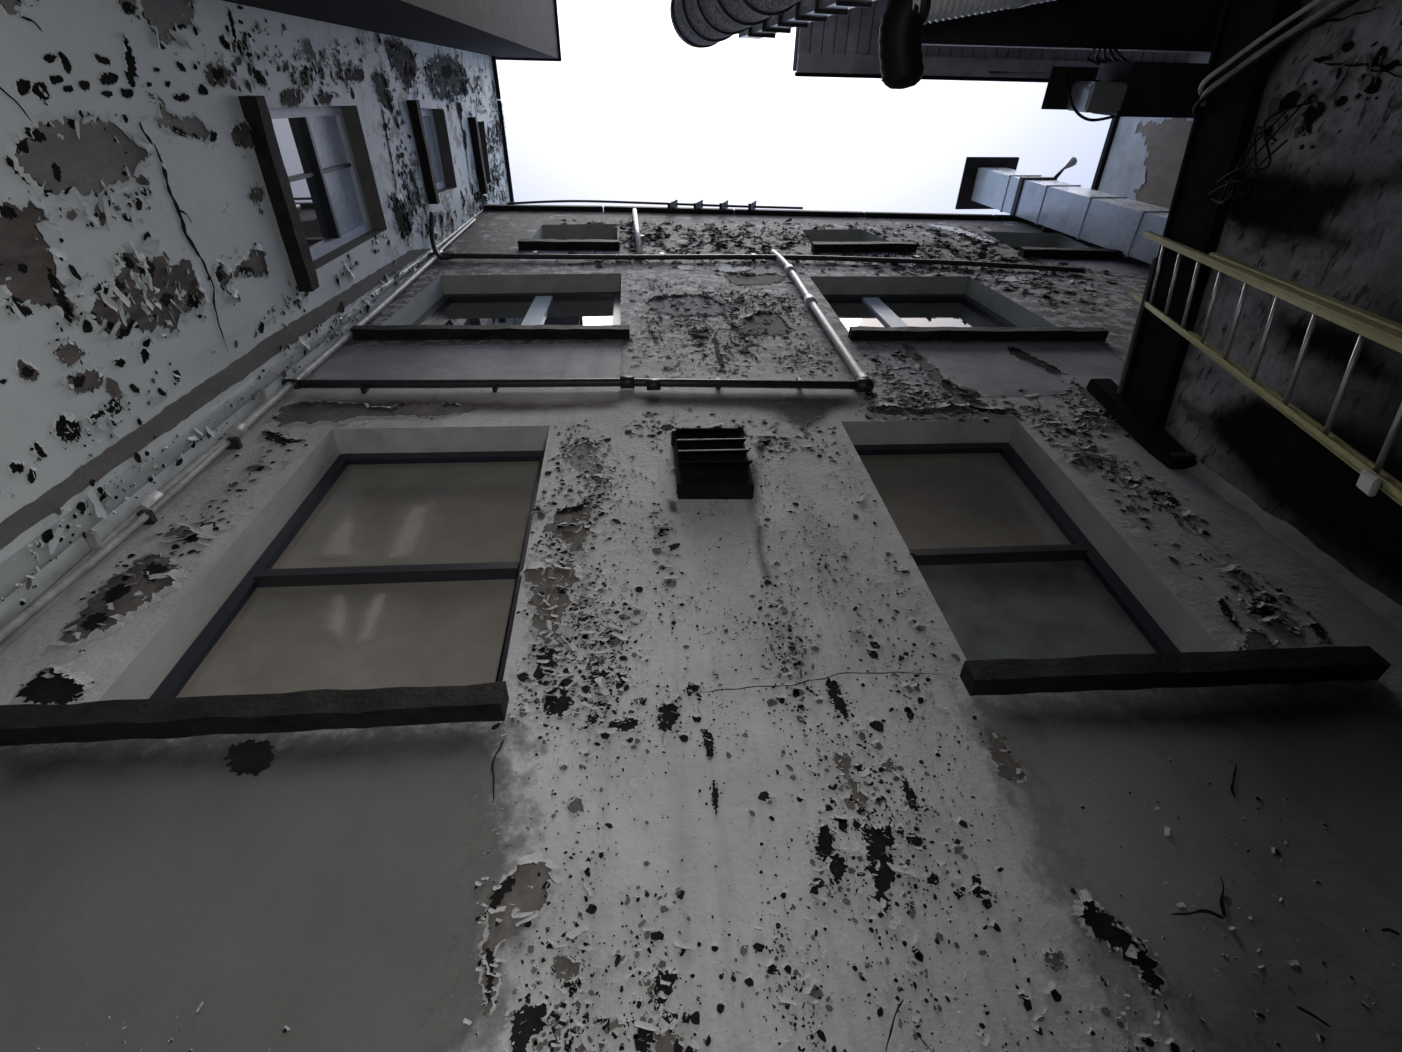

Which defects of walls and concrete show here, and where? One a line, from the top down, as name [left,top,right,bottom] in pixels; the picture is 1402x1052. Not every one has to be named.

peeling [0,0,508,704]
peeling [463,407,1195,1052]
peeling [555,218,1330,650]
peeling [1164,880,1265,983]